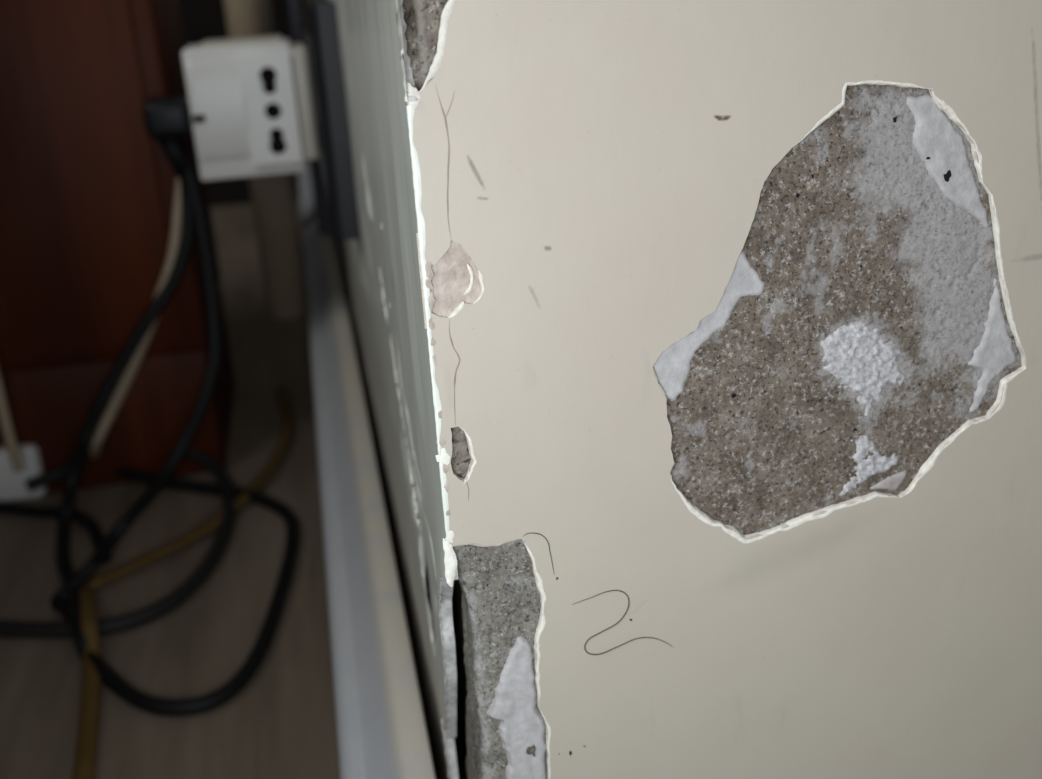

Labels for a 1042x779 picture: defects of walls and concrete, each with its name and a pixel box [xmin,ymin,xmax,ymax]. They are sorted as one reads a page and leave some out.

crack [379,265,437,656]
spalling [395,0,551,779]
spalling [652,80,1026,543]